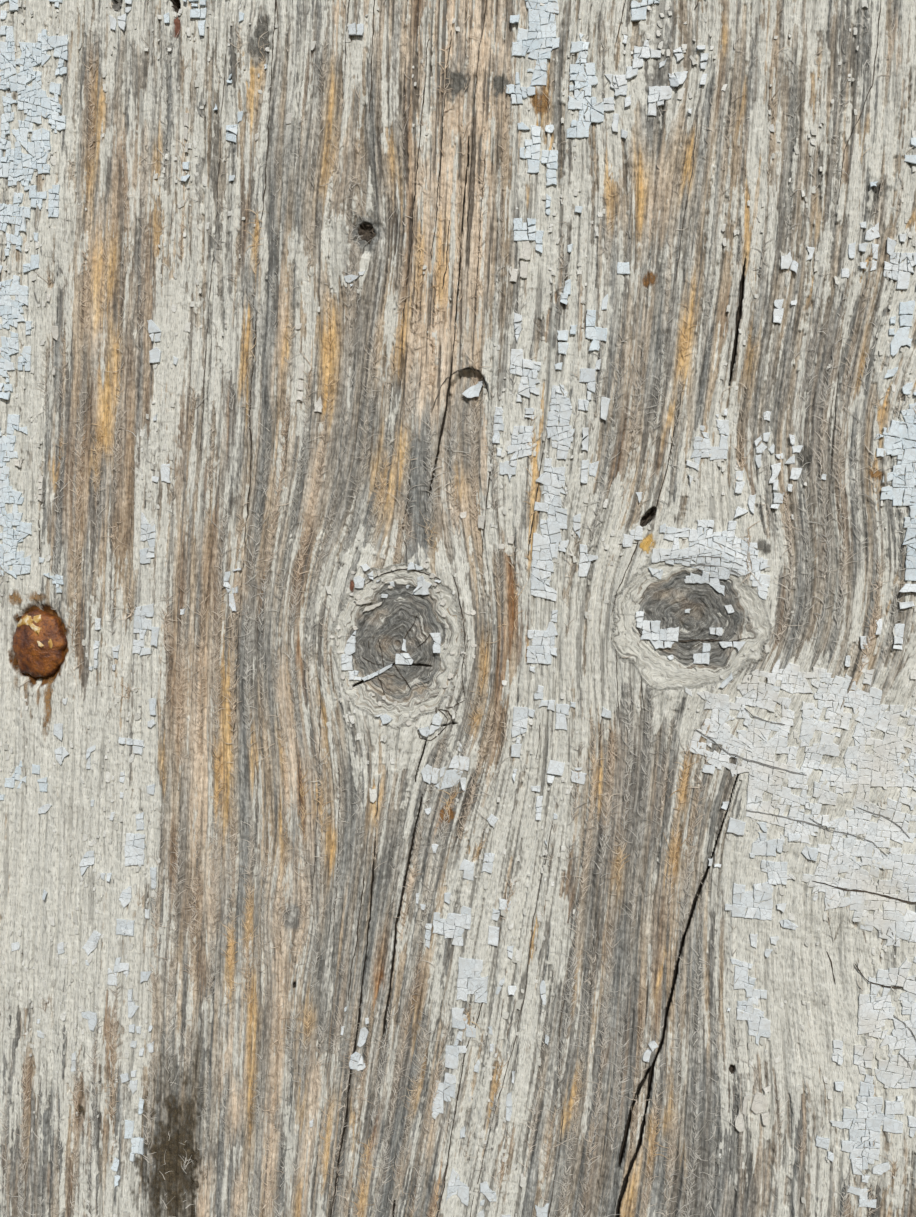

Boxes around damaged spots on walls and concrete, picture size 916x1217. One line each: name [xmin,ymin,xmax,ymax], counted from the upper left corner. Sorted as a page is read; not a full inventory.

peeling [0,0,69,593]
corrosion [8,591,69,730]
crack [296,0,487,1217]
peeling [492,294,610,782]
peeling [560,279,571,305]
peeling [506,0,709,282]
peeling [685,222,916,1208]
peeling [904,137,916,164]
crack [616,728,916,1217]